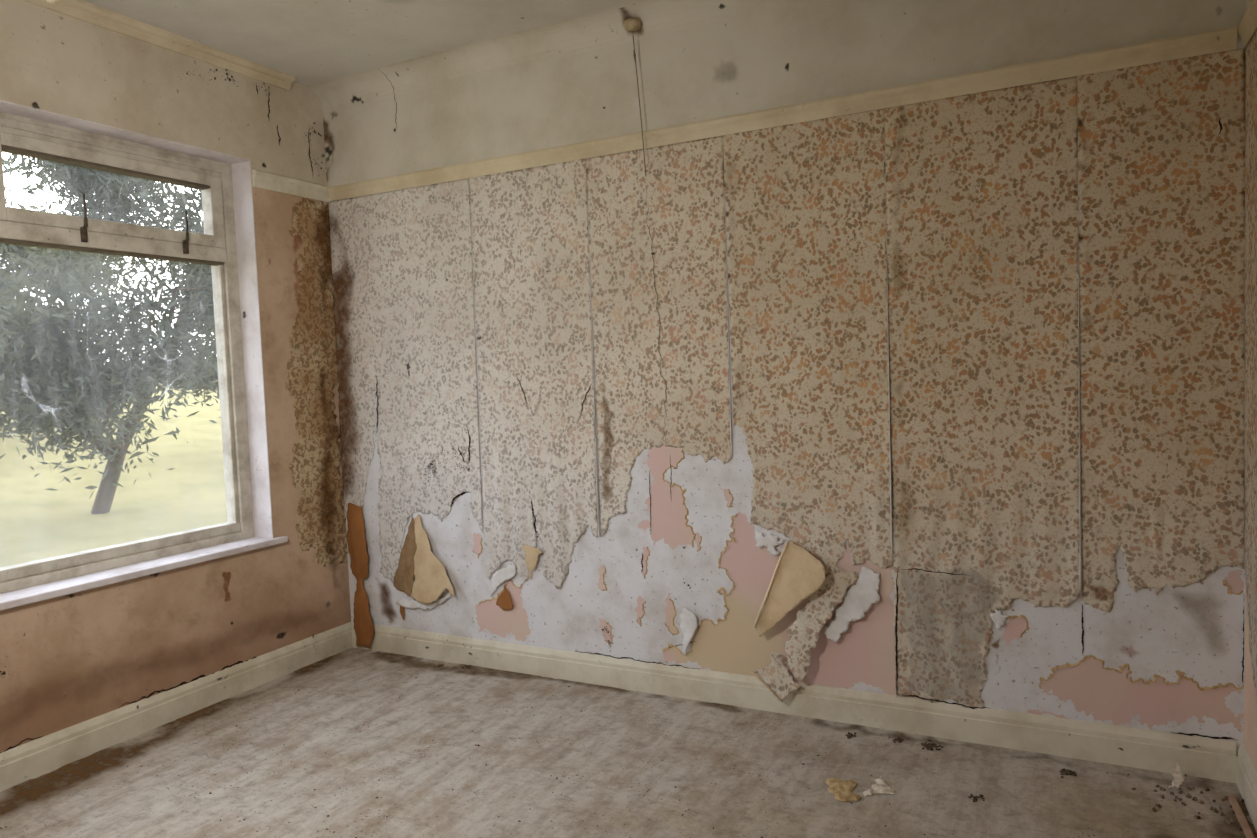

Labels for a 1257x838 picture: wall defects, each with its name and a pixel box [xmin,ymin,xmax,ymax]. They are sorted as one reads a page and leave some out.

damp [317,208,355,554]
peeling [638,445,702,579]
peeling [475,579,531,642]
peeling [598,618,614,645]
peeling [634,596,646,627]
peeling [662,487,896,695]
peeling [1002,615,1029,645]
peeling [1027,570,1257,771]